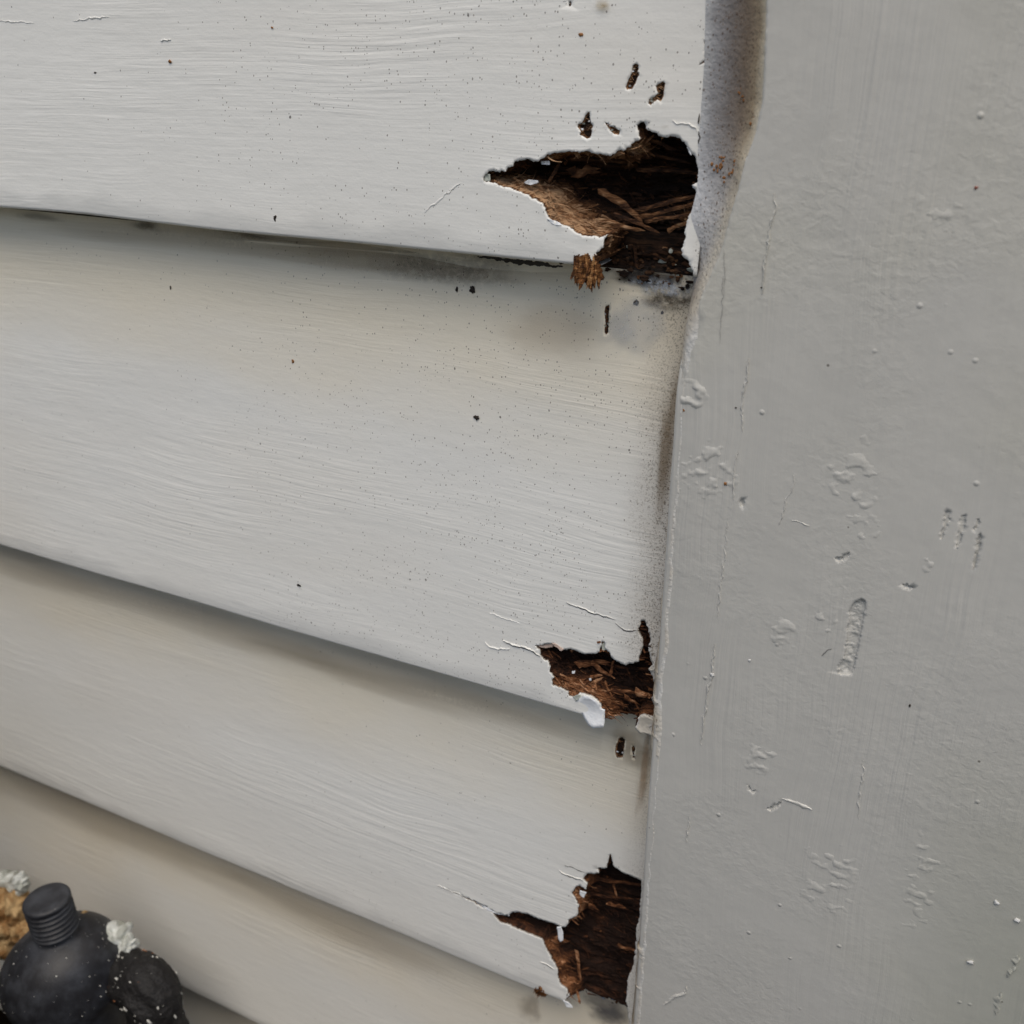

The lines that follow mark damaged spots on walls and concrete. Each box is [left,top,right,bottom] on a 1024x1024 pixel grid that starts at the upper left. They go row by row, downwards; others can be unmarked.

peeling [578,112,620,139]
peeling [573,695,605,728]
peeling [636,715,653,736]